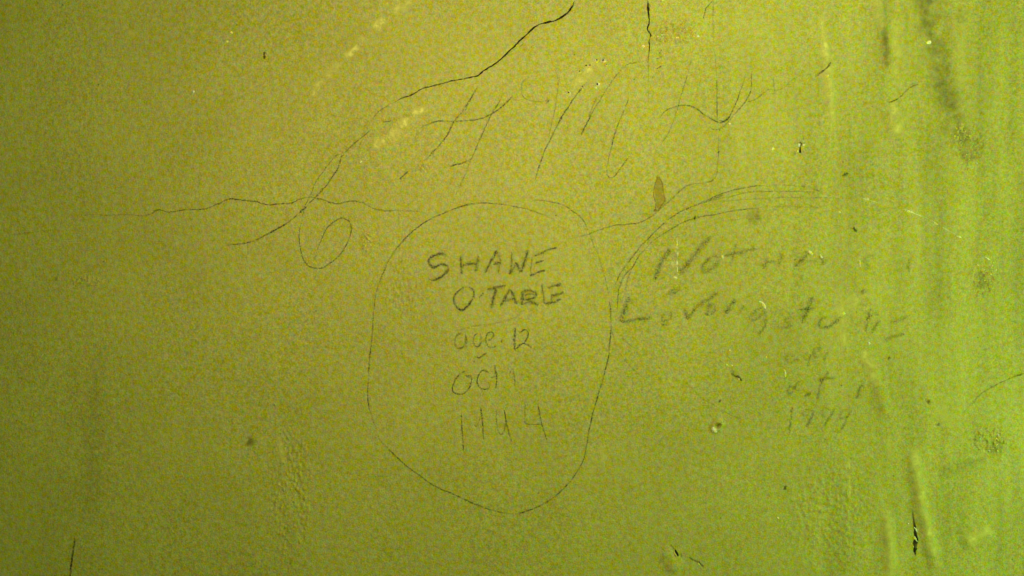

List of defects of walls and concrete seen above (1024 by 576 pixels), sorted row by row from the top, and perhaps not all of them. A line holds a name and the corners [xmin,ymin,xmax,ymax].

crack [385,4,574,122]
crack [644,3,655,51]